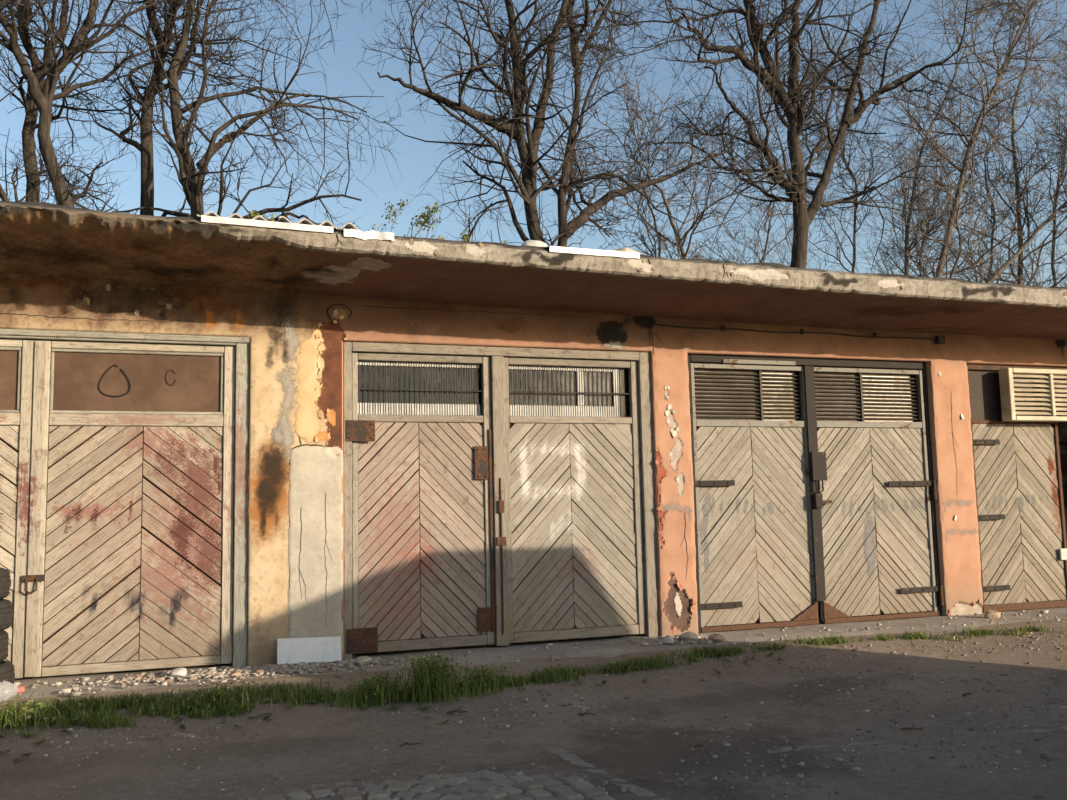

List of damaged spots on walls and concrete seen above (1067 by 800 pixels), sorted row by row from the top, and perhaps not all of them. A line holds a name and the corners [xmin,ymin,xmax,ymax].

water stain [151,218,243,238]
water stain [0,246,113,313]
peeling [655,386,685,548]
flaking render [661,572,696,634]